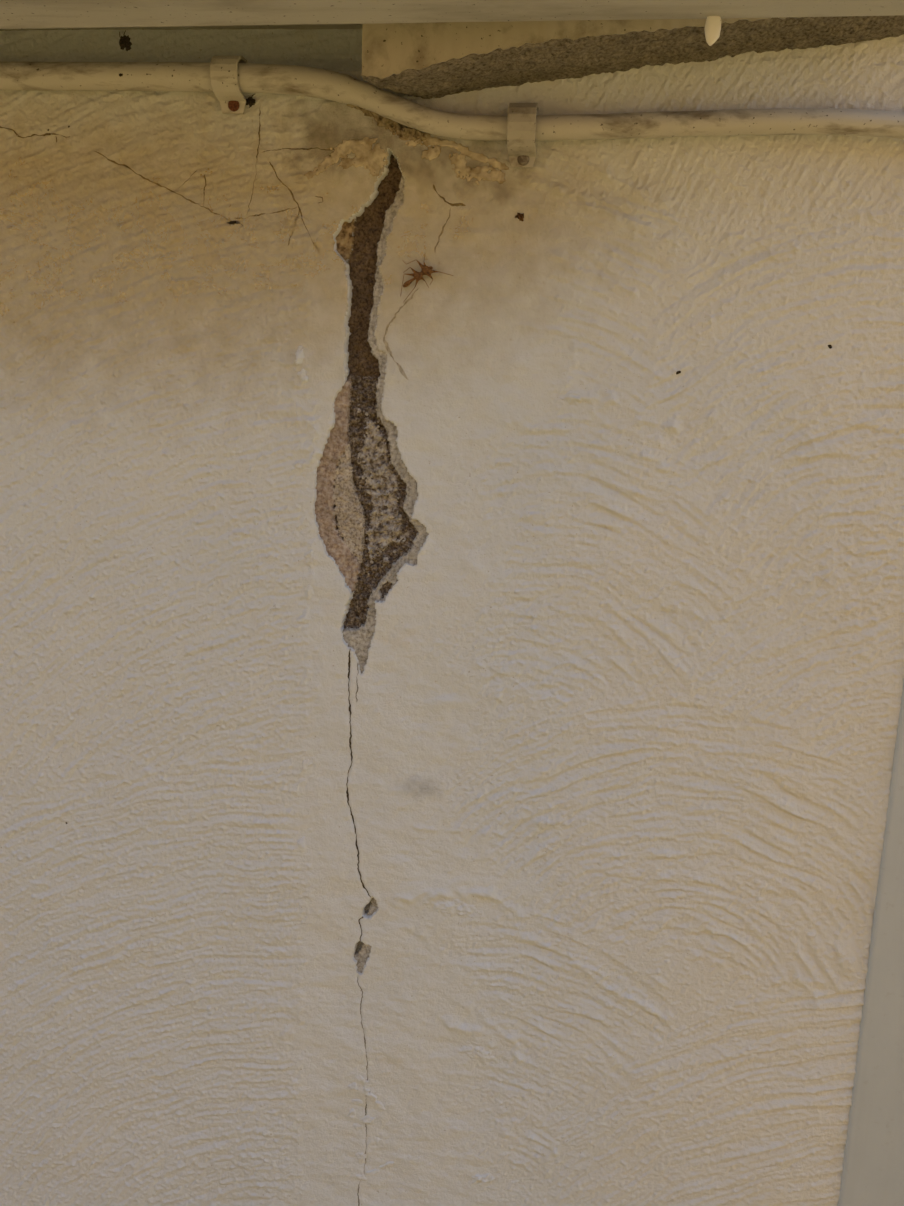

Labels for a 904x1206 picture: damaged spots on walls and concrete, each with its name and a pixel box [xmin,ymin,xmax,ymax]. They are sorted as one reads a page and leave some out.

crack [0,111,466,402]
peeling [304,137,389,181]
spalling [315,374,429,674]
crack [346,651,370,941]
crack [357,977,368,1206]